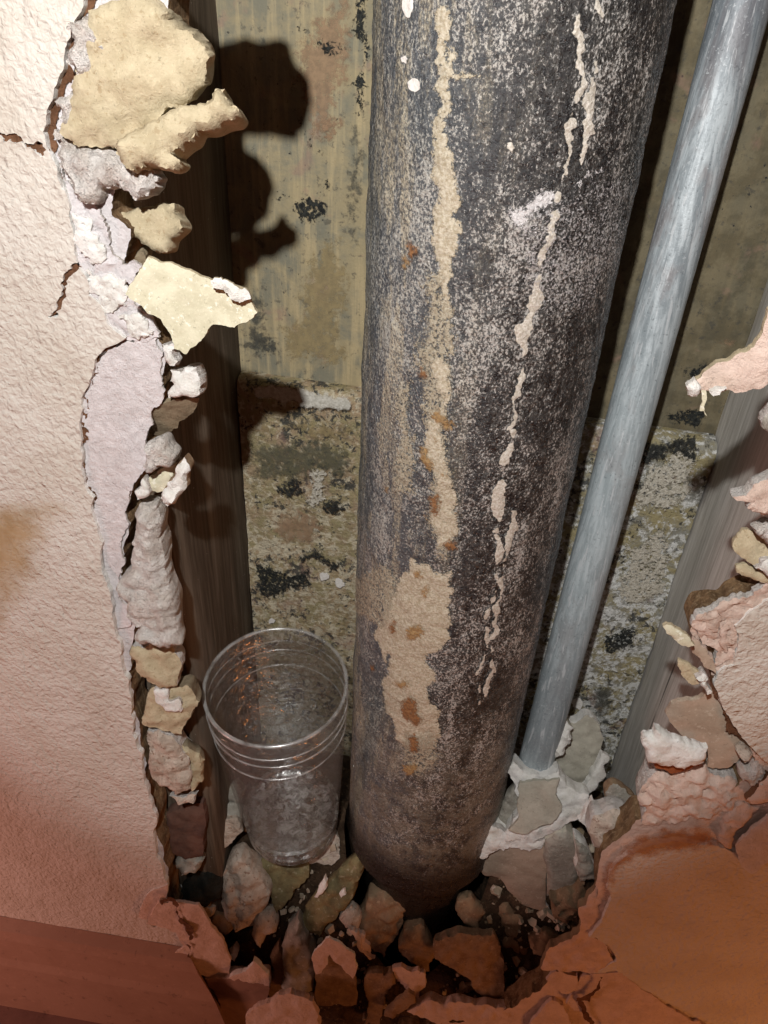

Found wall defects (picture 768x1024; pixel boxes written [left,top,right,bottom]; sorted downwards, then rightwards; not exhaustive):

crack [0,0,95,180]
crack [50,263,82,317]
flaking render [53,129,186,648]
damp [244,0,481,780]
damp [636,409,705,511]
damp [617,530,671,604]
corrosion [388,621,424,640]
damp [604,628,635,653]
flaking render [662,582,768,672]
flaking render [635,753,740,826]
peeling [735,814,768,874]
peeling [529,970,706,1024]